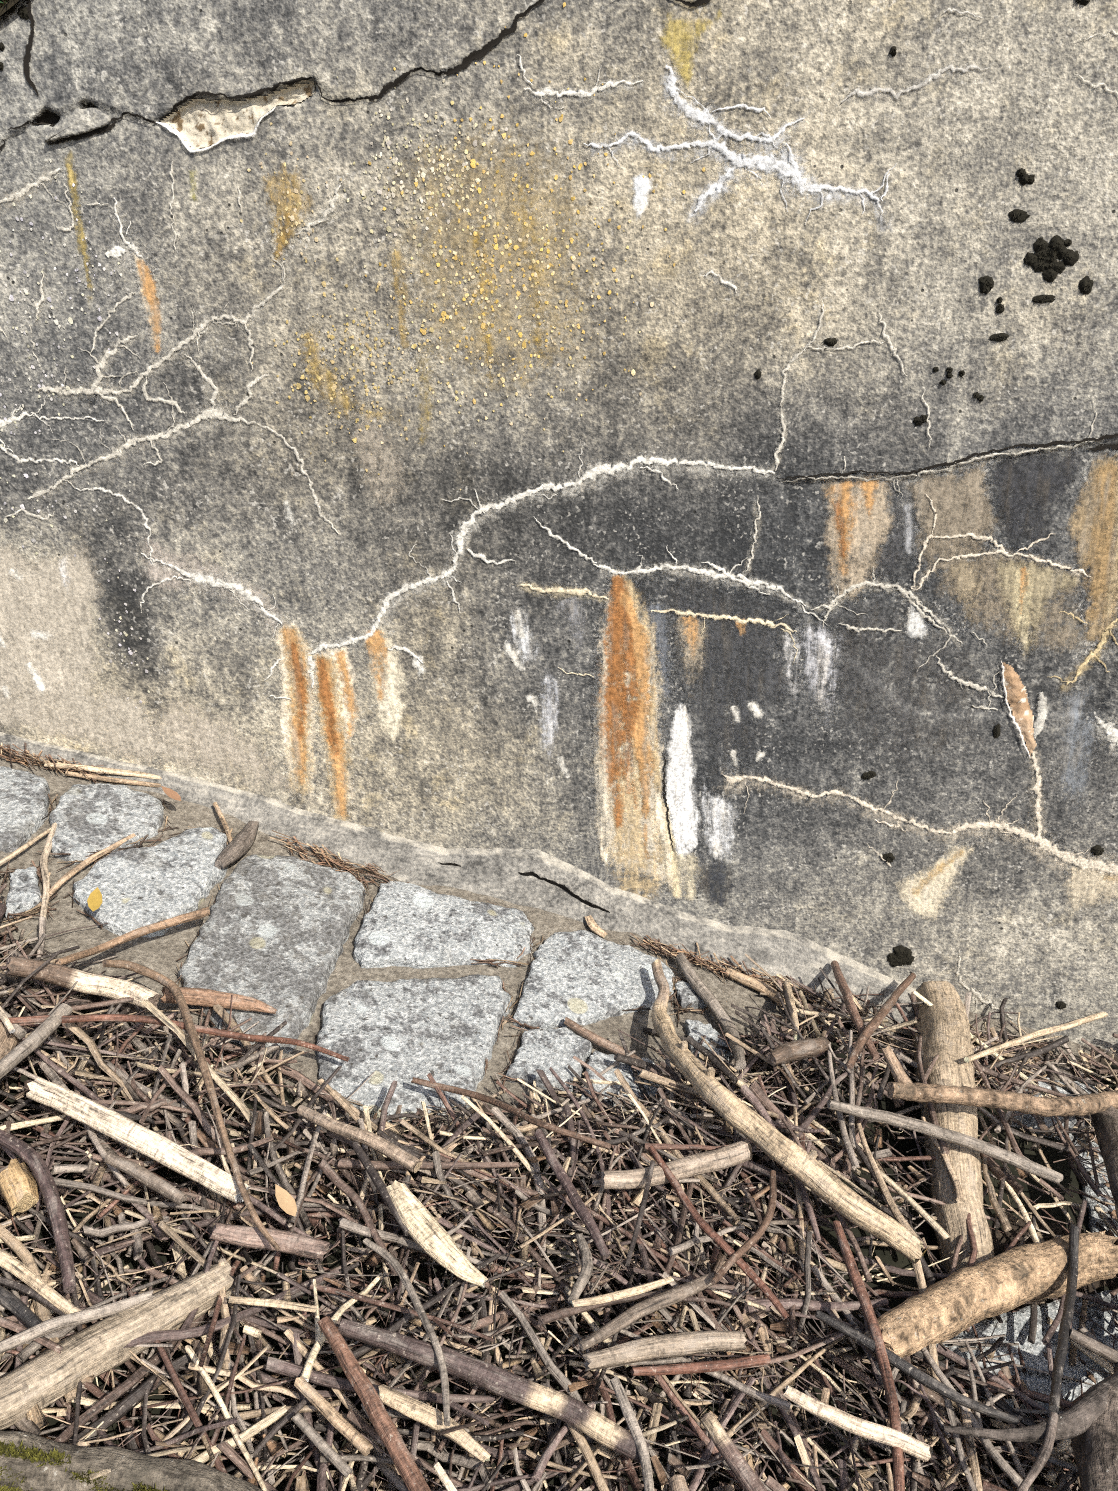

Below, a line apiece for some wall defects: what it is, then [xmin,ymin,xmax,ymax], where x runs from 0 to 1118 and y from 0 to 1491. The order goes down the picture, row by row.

spalling [156,81,315,153]
crack [0,0,1118,711]
corrosion [826,480,893,597]
corrosion [911,458,1118,655]
damp [505,610,537,670]
corrosion [276,623,405,821]
damp [526,678,569,778]
corrosion [594,575,673,897]
crack [663,754,676,854]
damp [649,583,973,906]
crack [724,751,1118,876]
crack [518,871,610,913]